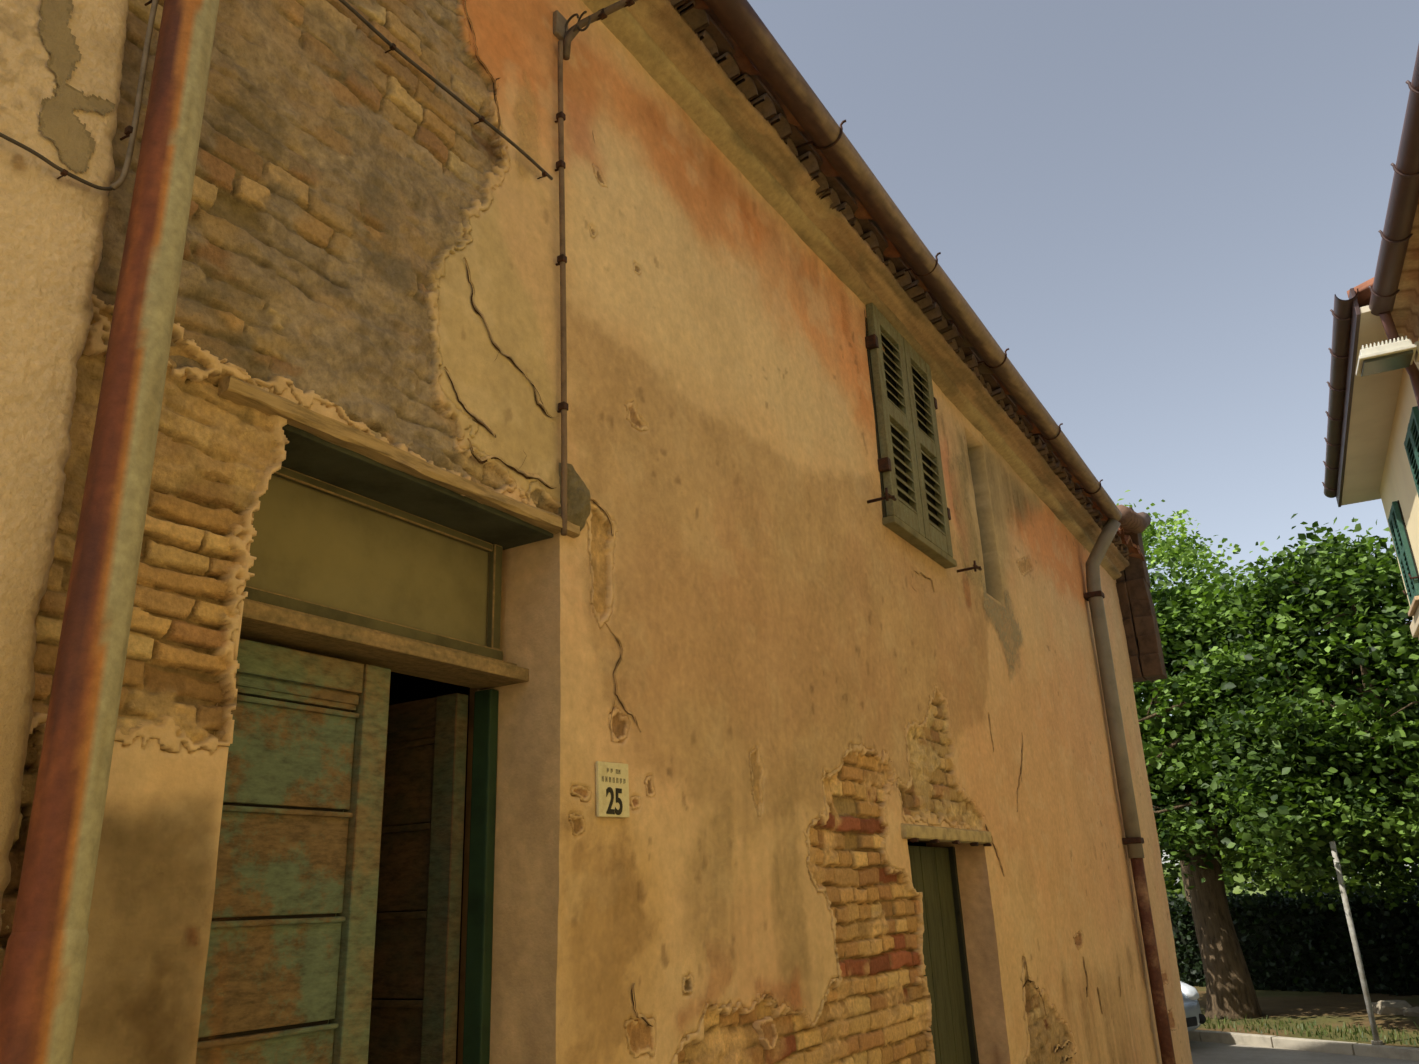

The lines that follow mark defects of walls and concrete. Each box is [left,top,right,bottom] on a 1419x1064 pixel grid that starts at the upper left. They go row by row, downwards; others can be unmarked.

flaking render [114,0,561,753]
crack [463,257,558,418]
flaking render [0,0,164,977]
spalling [608,707,629,743]
crack [603,622,641,732]
spalling [630,776,656,810]
flaking render [671,685,986,1064]
spalling [623,1017,656,1058]
flaking render [1020,956,1076,1064]